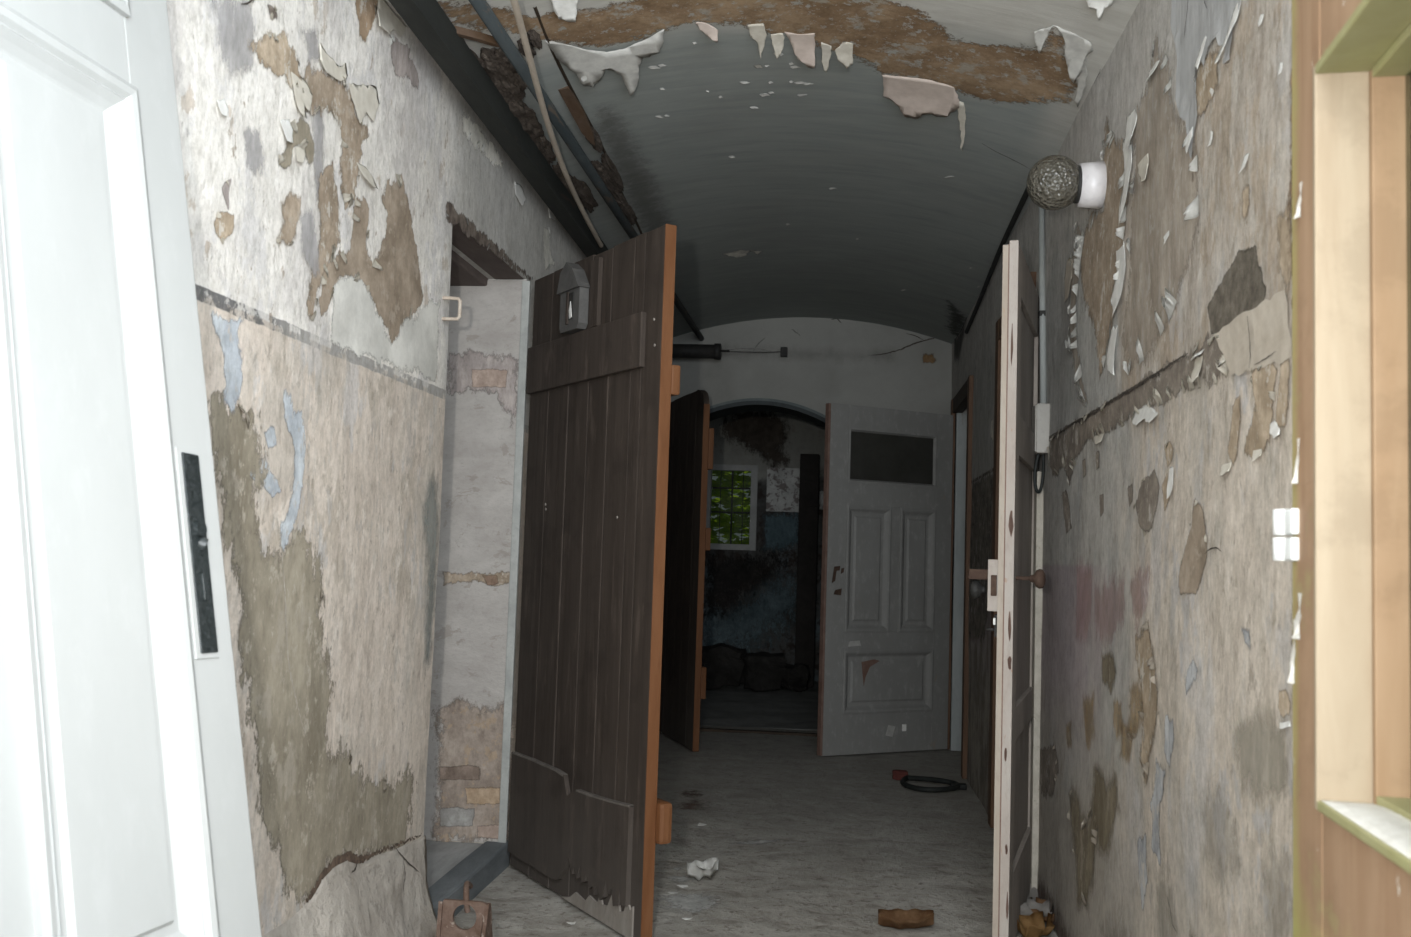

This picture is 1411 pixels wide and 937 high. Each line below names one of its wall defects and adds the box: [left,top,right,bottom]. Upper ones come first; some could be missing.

peeling [214,179,234,244]
peeling [249,0,423,344]
peeling [438,0,1094,226]
peeling [1047,0,1302,536]
damp [424,482,438,660]
spalling [1179,499,1221,595]
spalling [1278,593,1302,729]
peeling [1040,744,1059,800]
peeling [1135,621,1174,910]
crack [306,833,422,903]